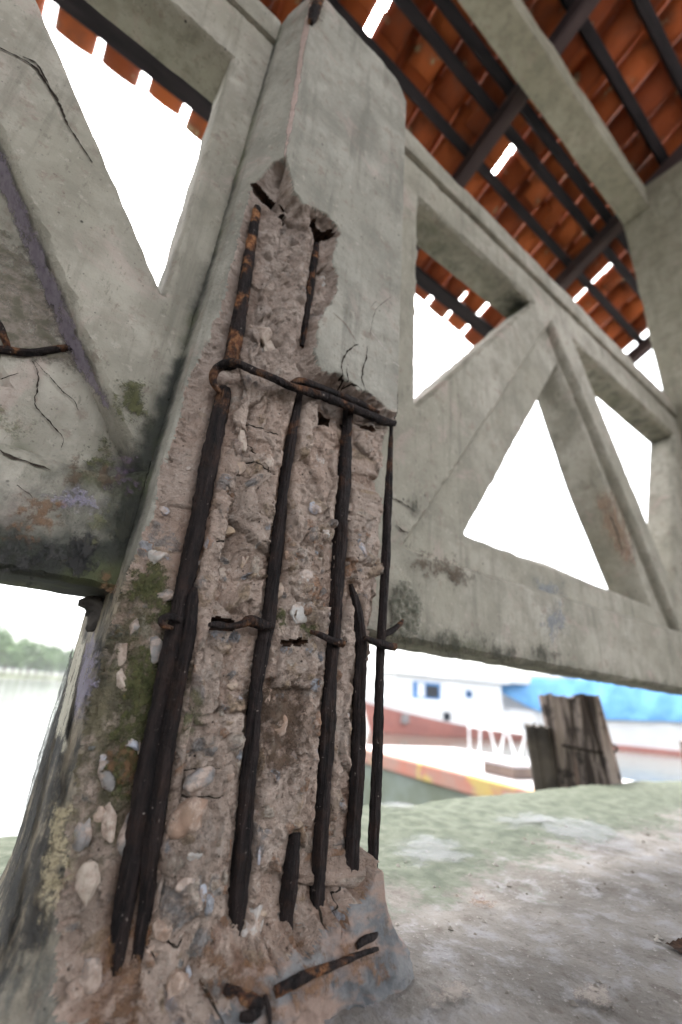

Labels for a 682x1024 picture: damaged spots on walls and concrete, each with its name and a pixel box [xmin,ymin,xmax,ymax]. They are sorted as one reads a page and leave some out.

crack [0,47,92,162]
crack [336,298,389,392]
crack [0,359,78,498]
spalling [49,0,404,1024]
leakage [0,630,86,953]
corrosion [194,945,282,1019]